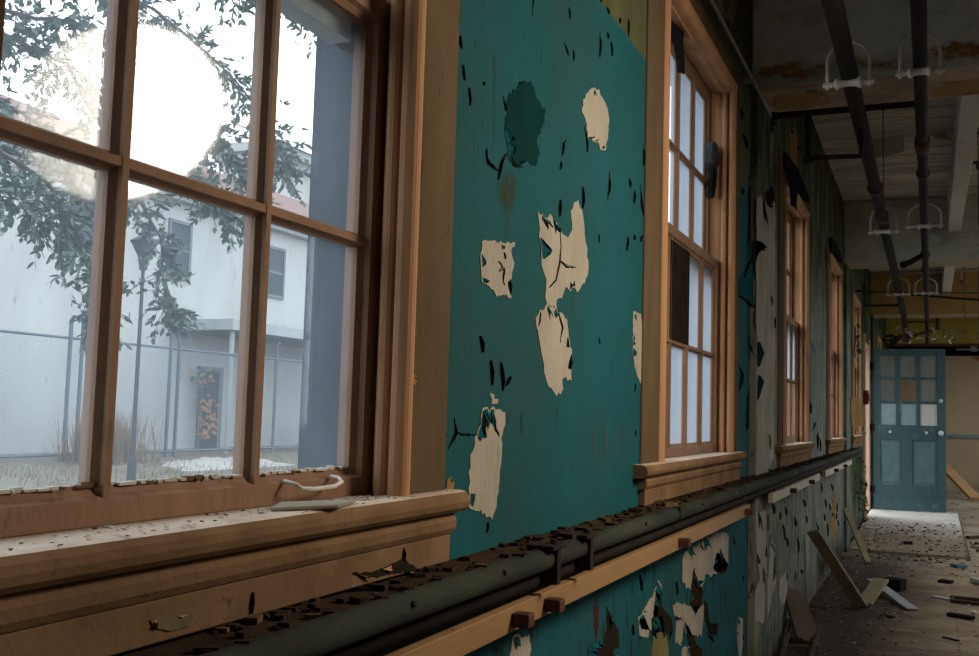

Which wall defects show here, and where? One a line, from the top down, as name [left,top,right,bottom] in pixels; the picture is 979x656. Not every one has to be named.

peeling [581,87,609,151]
corrosion [929,41,979,59]
peeling [929,78,979,98]
peeling [480,240,515,299]
peeling [535,200,589,396]
peeling [745,175,776,476]
peeling [468,393,506,533]
peeling [509,633,531,656]
peeling [638,530,729,656]
peeling [754,510,789,624]